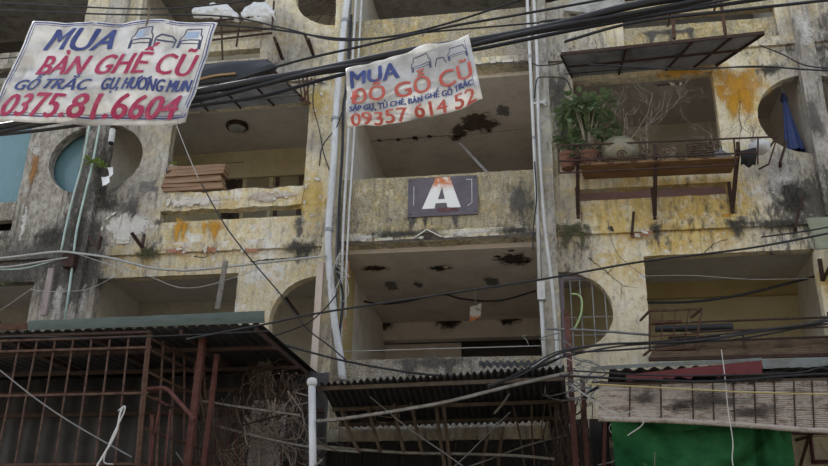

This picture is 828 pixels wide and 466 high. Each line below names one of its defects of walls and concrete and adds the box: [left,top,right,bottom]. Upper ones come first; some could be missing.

damp [657,64,782,116]
corrosion [29,154,39,185]
spalling [160,194,228,207]
damp [724,171,809,240]
corrosion [174,219,187,240]
corrosion [202,221,220,240]